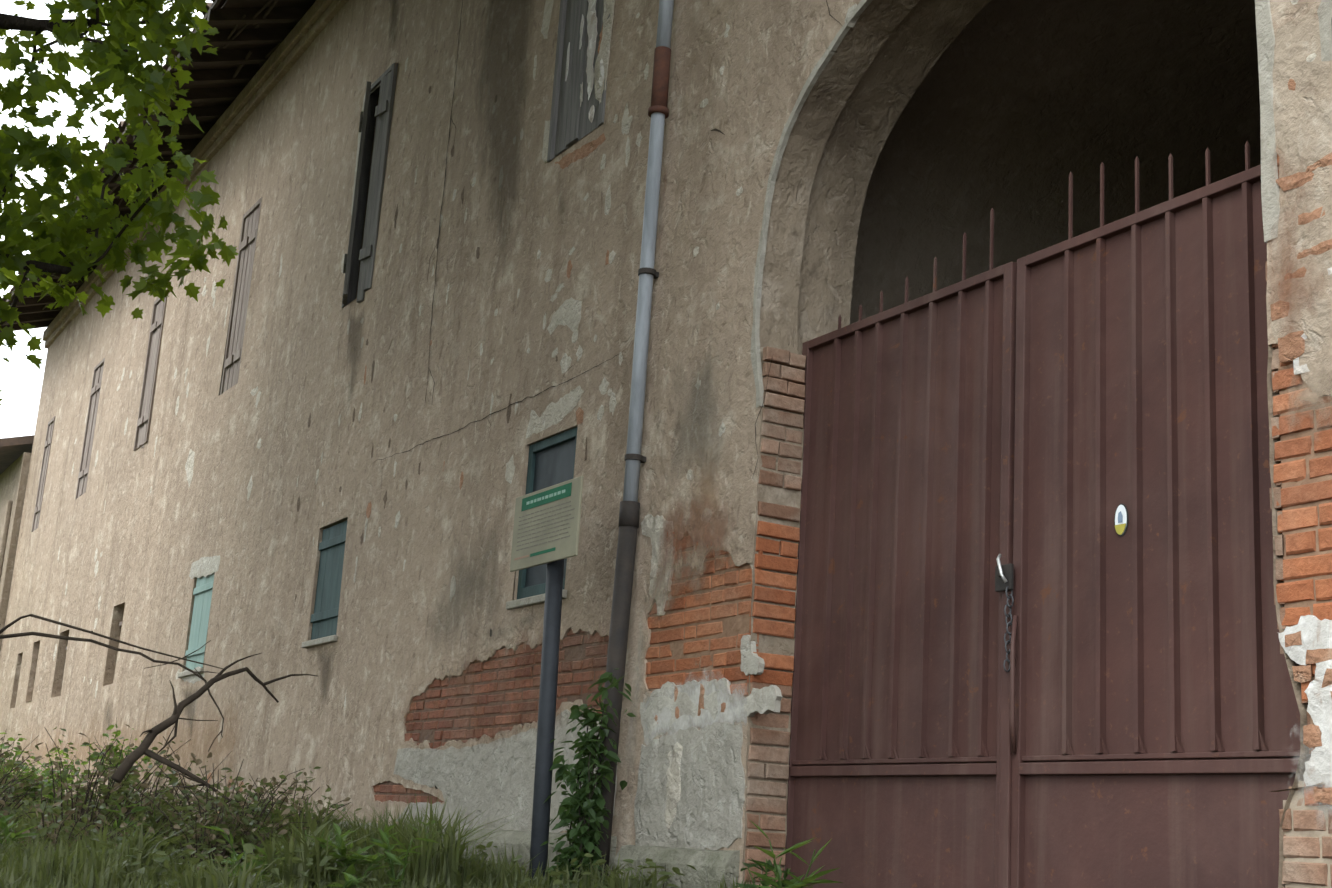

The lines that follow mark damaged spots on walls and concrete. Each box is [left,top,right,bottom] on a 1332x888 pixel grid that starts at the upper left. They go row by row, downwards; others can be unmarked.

crack [425,0,463,401]
crack [378,348,627,460]
flaking render [758,346,806,491]
flaking render [1269,344,1332,654]
flaking render [405,643,542,749]
flaking render [556,629,609,717]
flaking render [645,501,801,887]
flaking render [1299,663,1322,760]
flaking render [373,781,444,804]